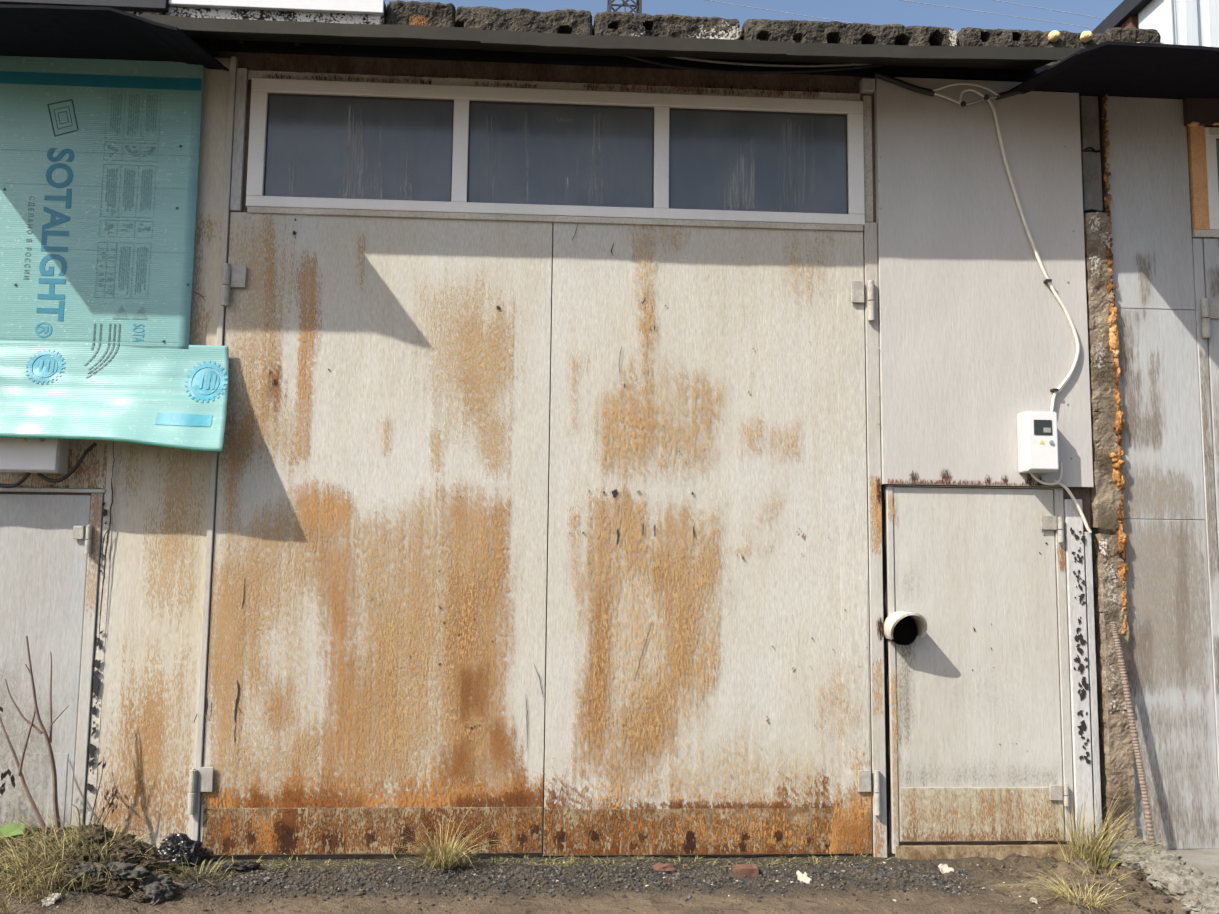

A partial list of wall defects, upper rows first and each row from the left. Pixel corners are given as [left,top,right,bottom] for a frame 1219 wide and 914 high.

peeling [1093,256,1160,446]
rust [146,452,203,610]
rust [202,220,1060,857]
peeling [1070,352,1219,848]
rust [94,650,191,838]